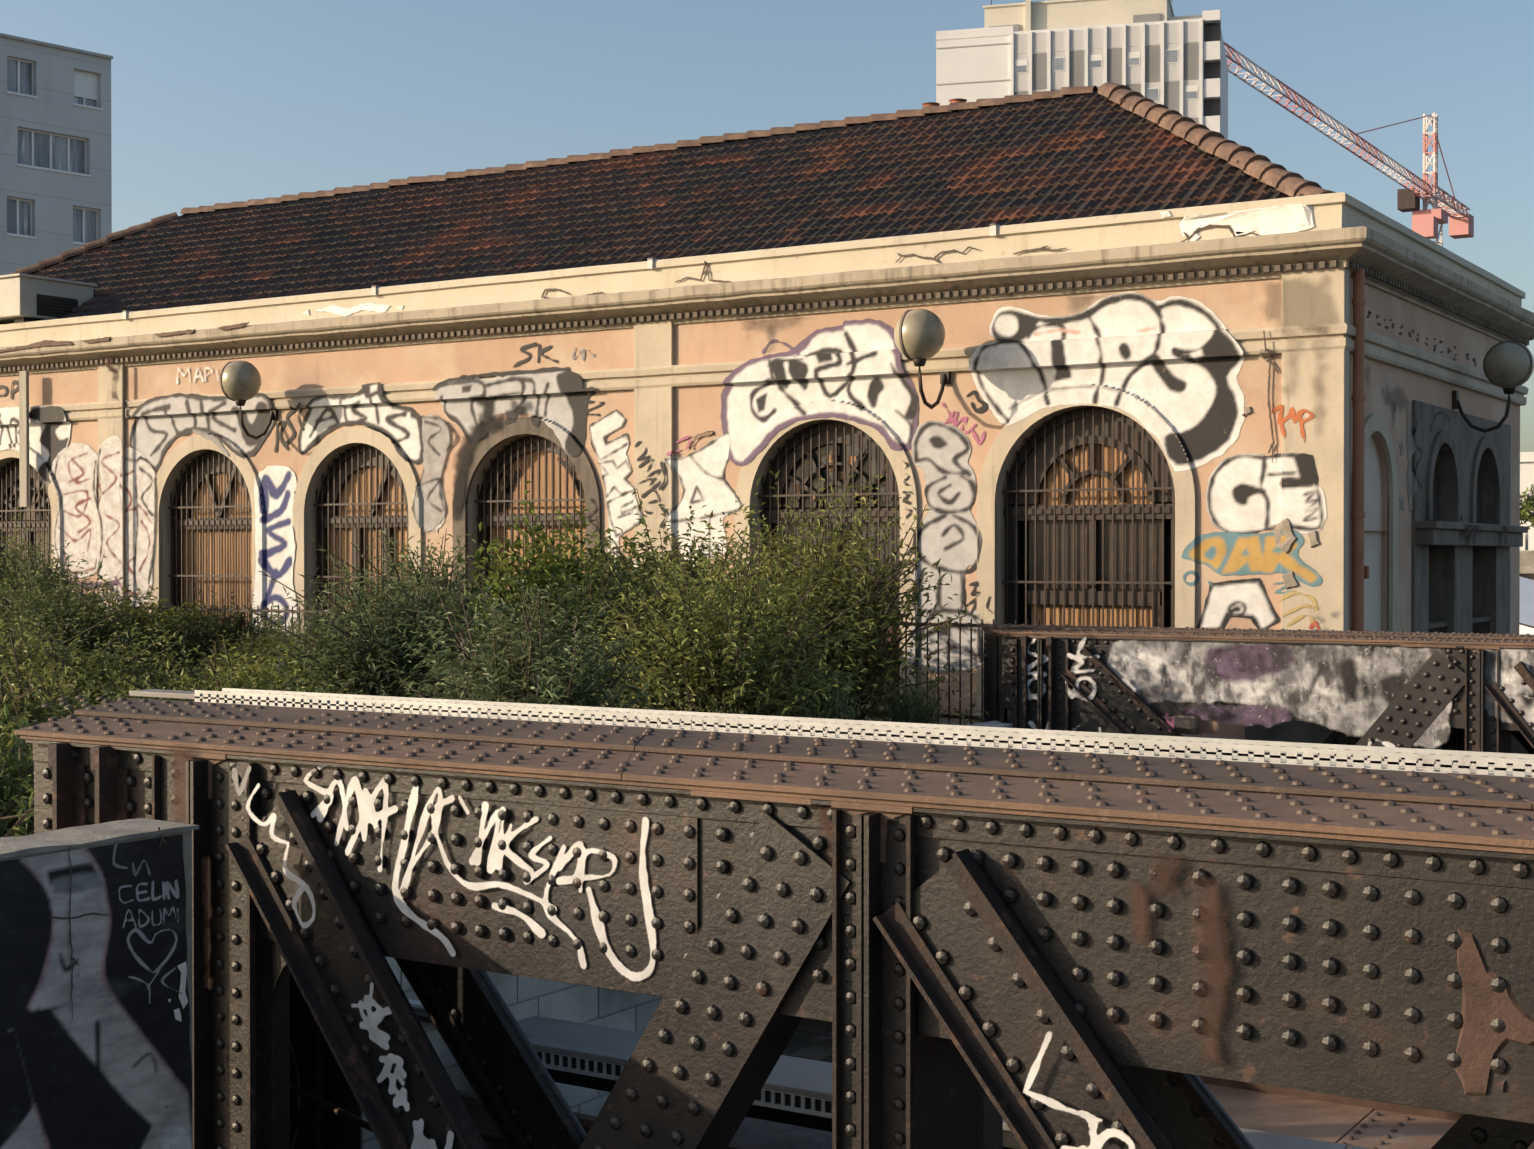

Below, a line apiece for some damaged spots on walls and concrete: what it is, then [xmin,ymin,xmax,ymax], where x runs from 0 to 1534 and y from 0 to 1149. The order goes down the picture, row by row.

crack [895,245,1067,263]
peeling [1160,203,1316,241]
rust [1130,856,1179,941]
rust [1197,882,1230,1062]